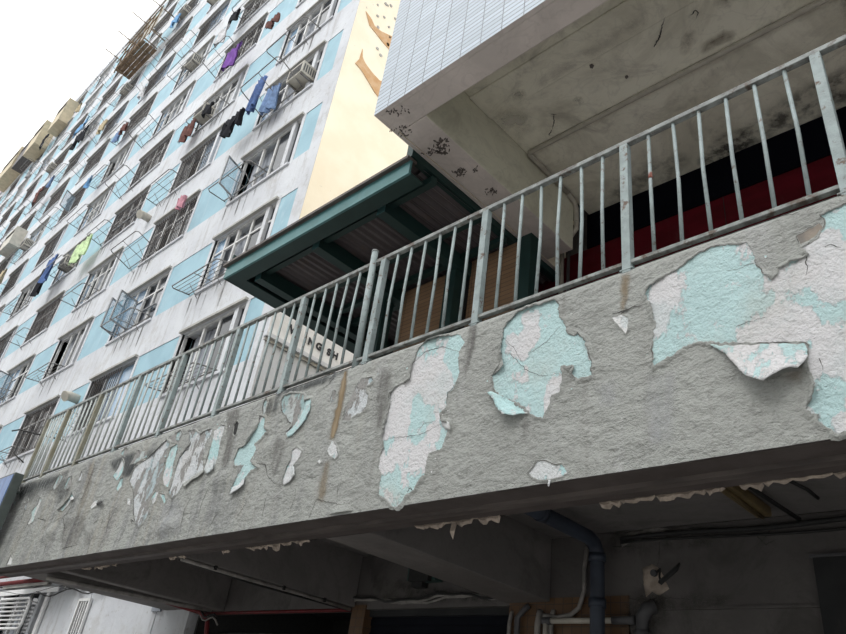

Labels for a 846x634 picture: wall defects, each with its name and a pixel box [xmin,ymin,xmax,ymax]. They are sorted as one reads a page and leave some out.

damp [828,74,846,102]
damp [767,96,810,132]
damp [704,131,755,163]
peeling [610,201,846,441]
peeling [487,296,600,422]
rust [331,371,347,438]
peeling [377,332,468,511]
peeling [113,391,314,529]
peeling [526,459,569,486]
peeling [599,487,726,509]
peeling [739,471,846,492]
peeling [415,515,500,539]